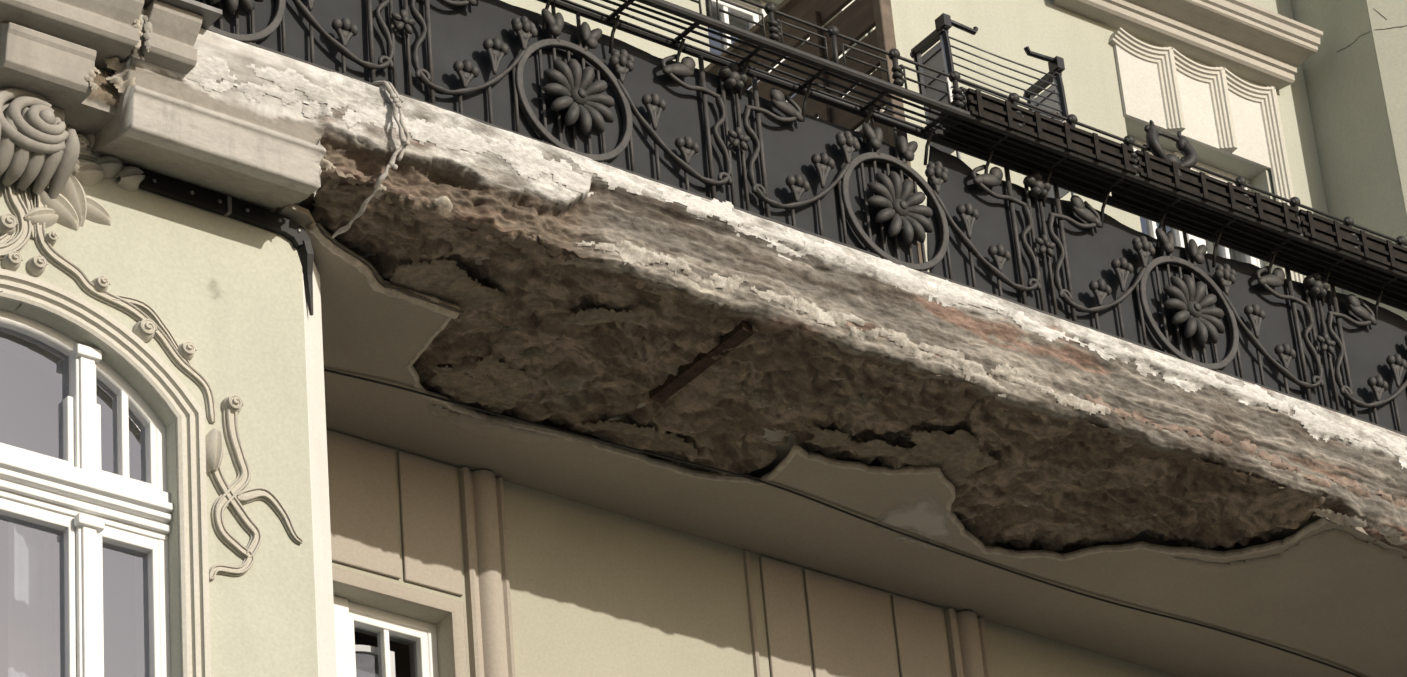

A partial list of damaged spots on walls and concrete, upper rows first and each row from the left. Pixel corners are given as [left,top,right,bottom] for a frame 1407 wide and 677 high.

crack [130,7,153,61]
crack [1337,9,1407,52]
peeling [177,51,1407,574]